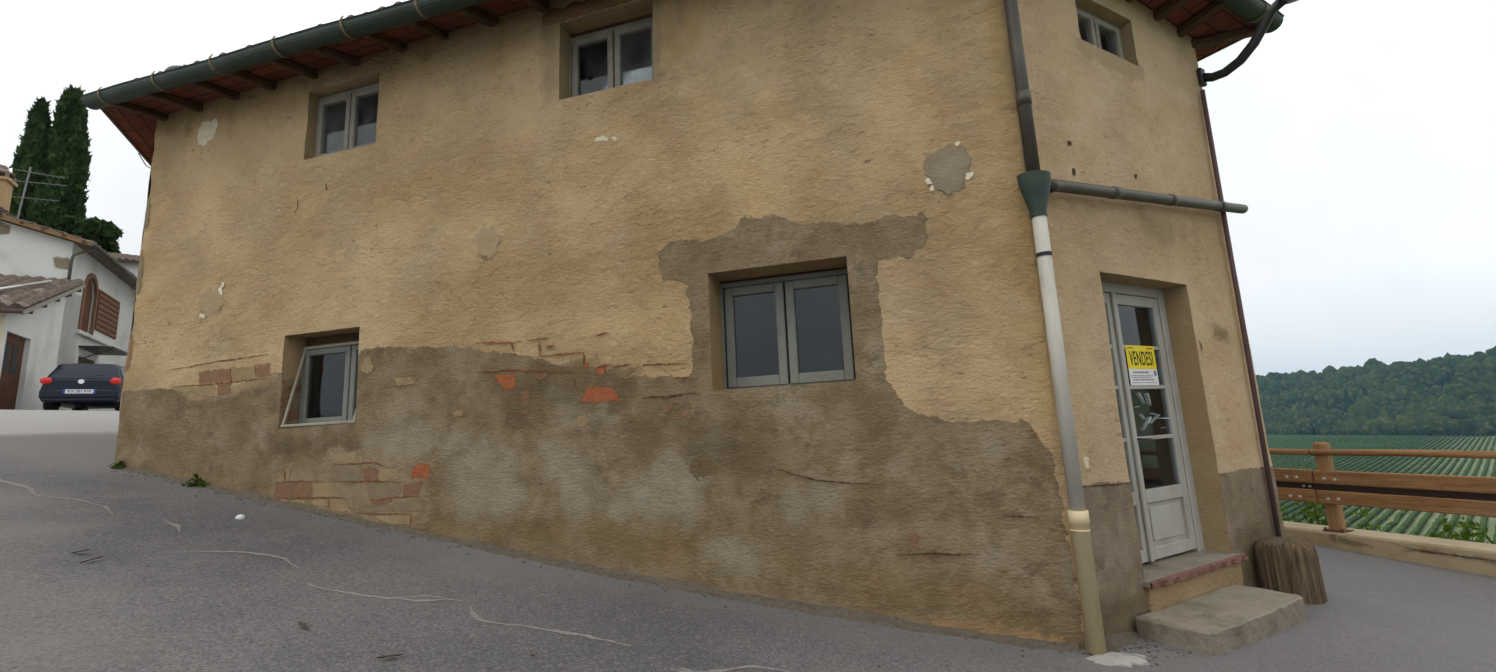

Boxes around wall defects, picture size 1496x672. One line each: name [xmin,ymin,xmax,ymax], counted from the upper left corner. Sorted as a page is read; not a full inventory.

spalling [195,116,221,150]
flaking render [114,178,1144,650]
crack [771,466,879,485]